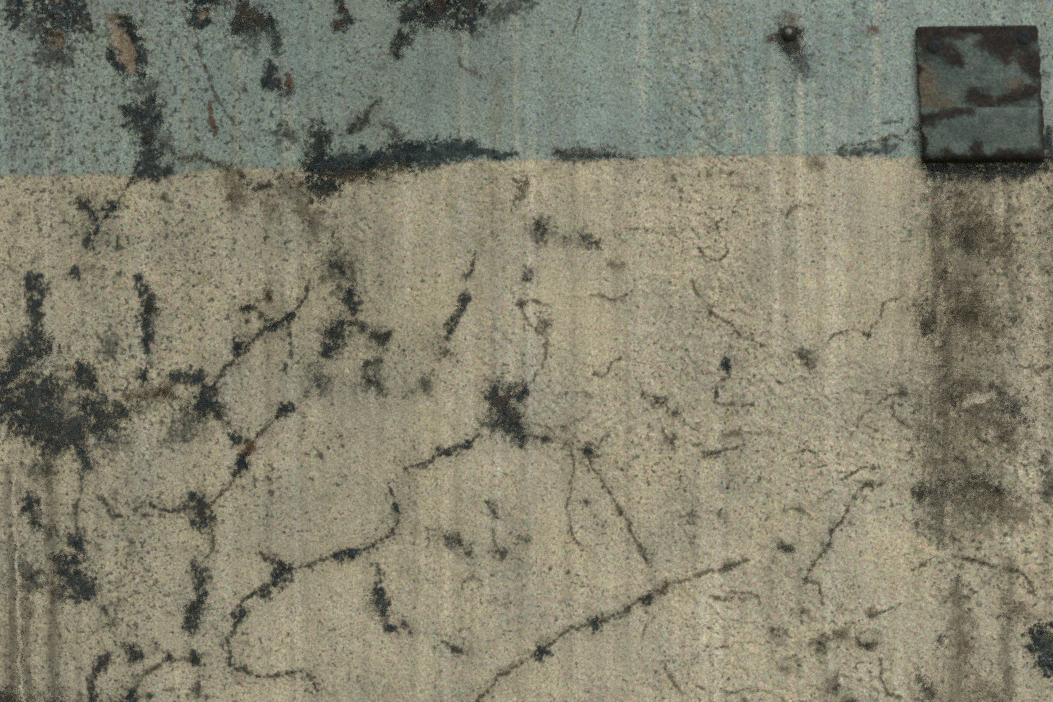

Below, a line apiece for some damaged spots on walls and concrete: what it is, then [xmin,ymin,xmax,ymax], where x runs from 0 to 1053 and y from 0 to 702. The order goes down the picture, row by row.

mould [224,0,295,98]
mould [331,0,354,31]
mould [389,27,415,60]
mould [120,80,307,191]
leakage [63,247,95,281]
crack [76,177,134,249]
leakage [0,270,160,702]
crack [74,285,310,559]
crack [516,299,650,565]
crack [690,280,782,437]
crack [116,435,480,702]
crack [476,558,762,702]